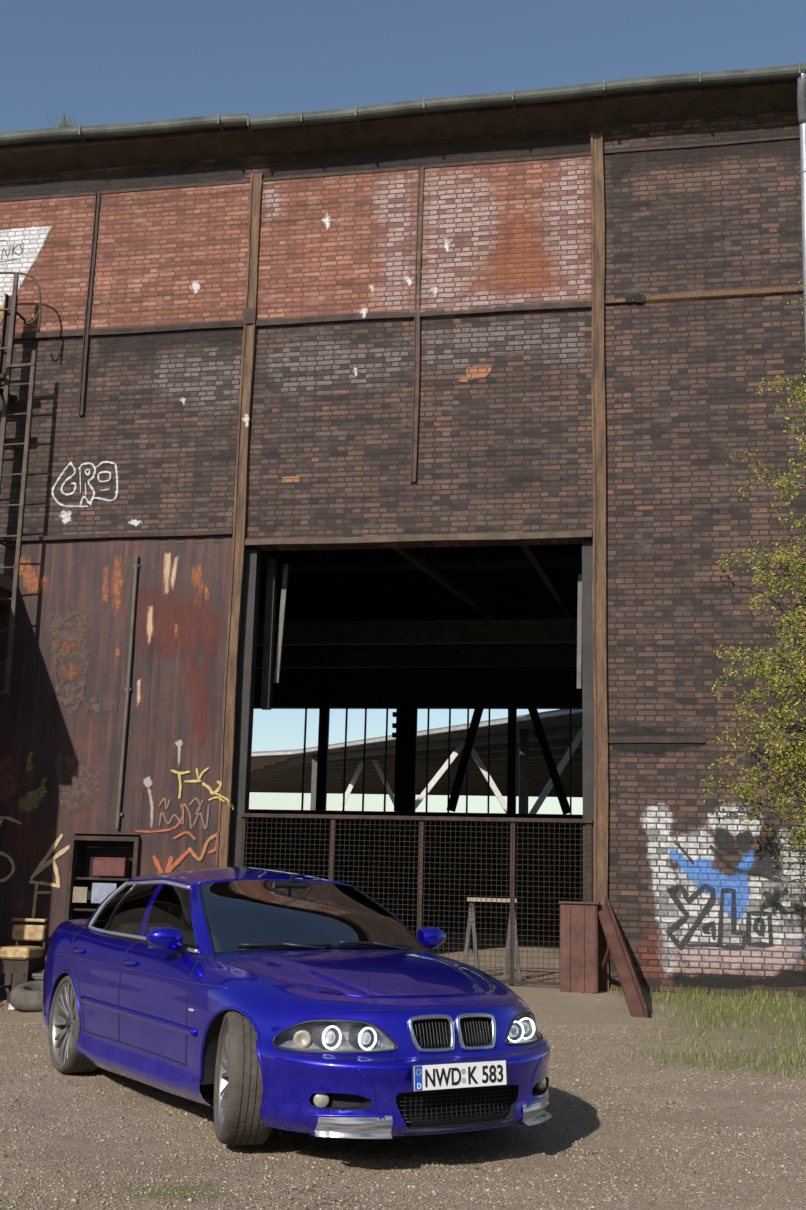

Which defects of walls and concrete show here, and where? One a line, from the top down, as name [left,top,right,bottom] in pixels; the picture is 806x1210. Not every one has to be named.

spalling [459,365,491,382]
rust [19,557,45,595]
rust [102,560,123,608]
rust [164,553,178,593]
peeling [50,611,120,713]
peeling [19,753,100,812]